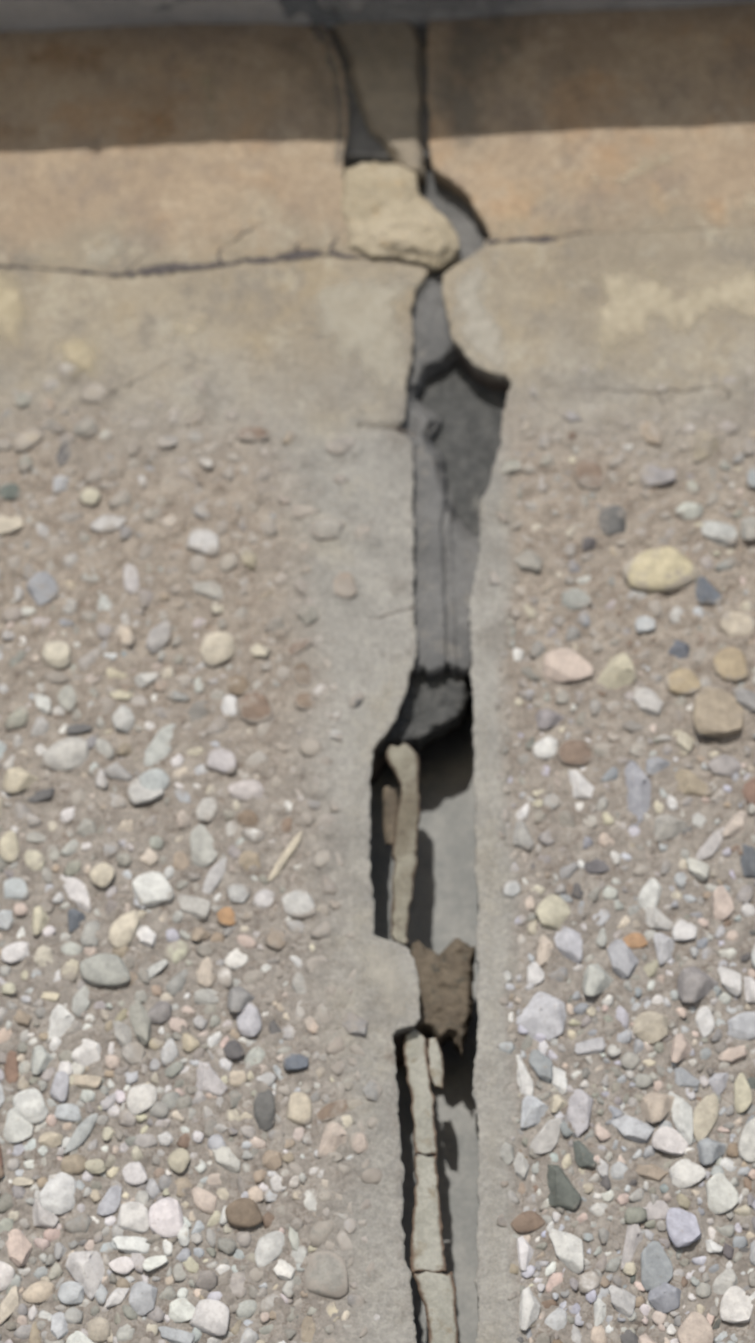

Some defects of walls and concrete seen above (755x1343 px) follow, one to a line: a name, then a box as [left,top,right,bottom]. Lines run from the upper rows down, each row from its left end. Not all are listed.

crack [278,0,342,25]
crack [0,229,419,277]